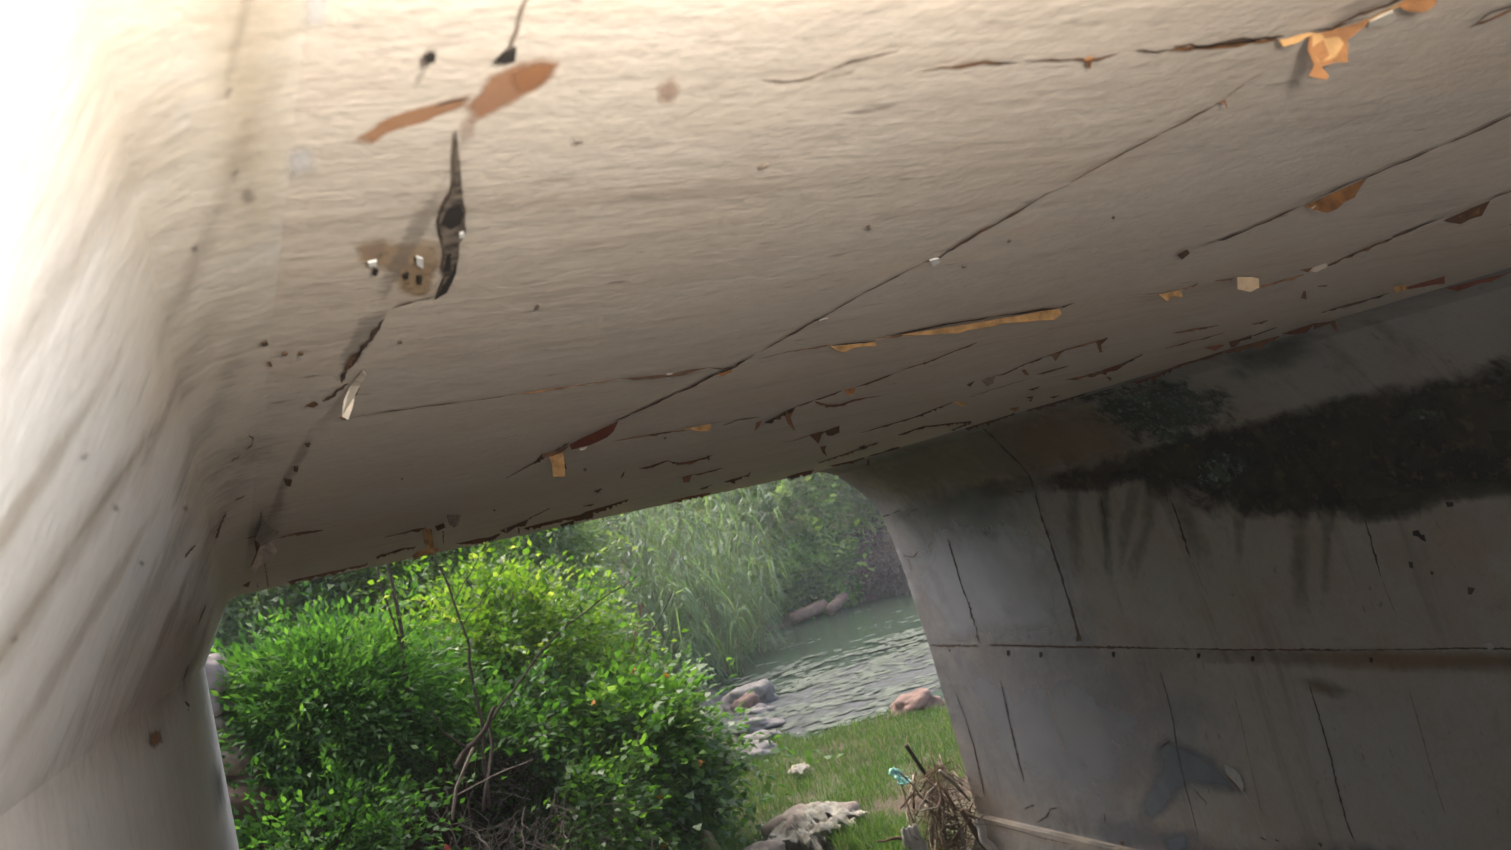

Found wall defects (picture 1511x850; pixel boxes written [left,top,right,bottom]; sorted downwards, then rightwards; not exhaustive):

crack [496,0,528,64]
peeling [1278,0,1437,80]
crack [1333,0,1401,28]
peeling [1471,6,1511,28]
peeling [360,130,466,300]
peeling [892,303,1073,336]
crack [306,35,1511,847]
damp [959,667,1188,850]